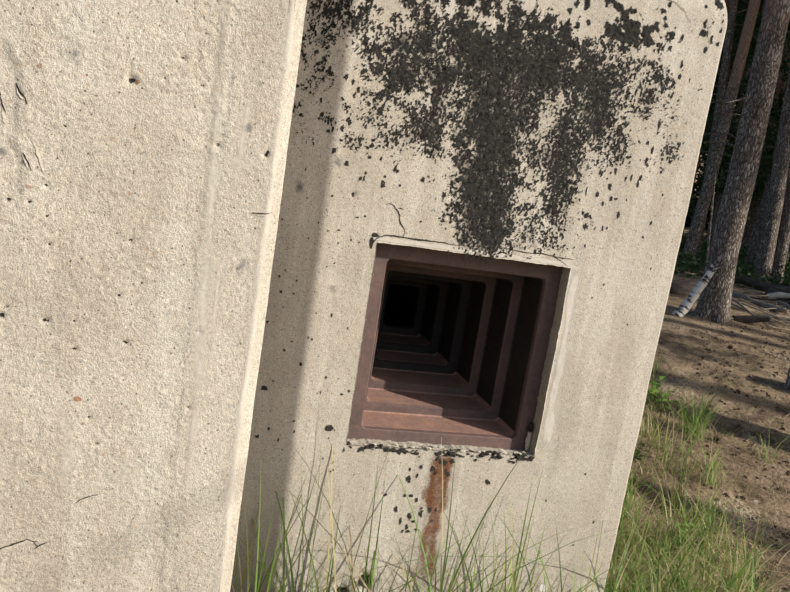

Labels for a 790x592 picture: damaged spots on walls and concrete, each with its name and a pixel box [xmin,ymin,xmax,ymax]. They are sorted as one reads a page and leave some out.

crack [0,83,27,113]
damp [446,0,620,265]
crack [369,203,481,247]
rust [421,457,452,576]
crack [0,539,47,551]